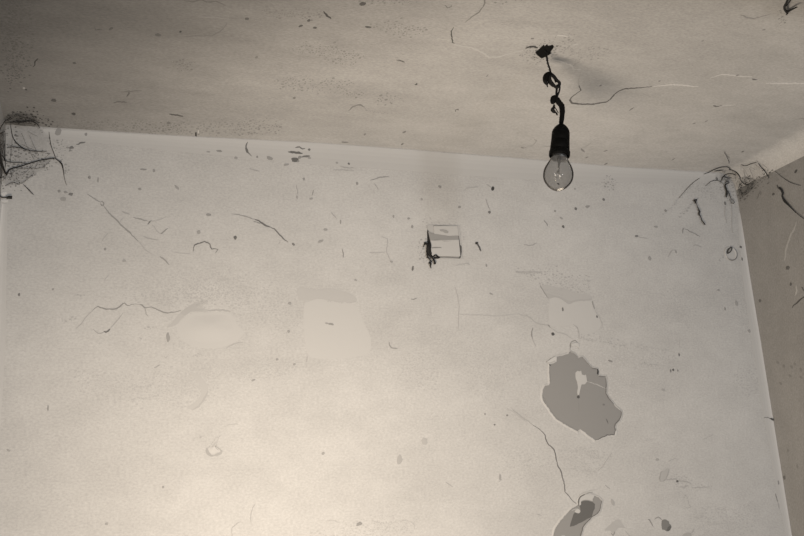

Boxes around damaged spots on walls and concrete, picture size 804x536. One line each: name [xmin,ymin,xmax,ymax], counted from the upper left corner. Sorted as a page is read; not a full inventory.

crack [451,0,524,58]
crack [569,70,804,105]
crack [65,294,229,339]
crack [454,285,625,389]
peeling [540,349,623,442]
crack [508,408,612,536]
peeling [551,492,604,536]